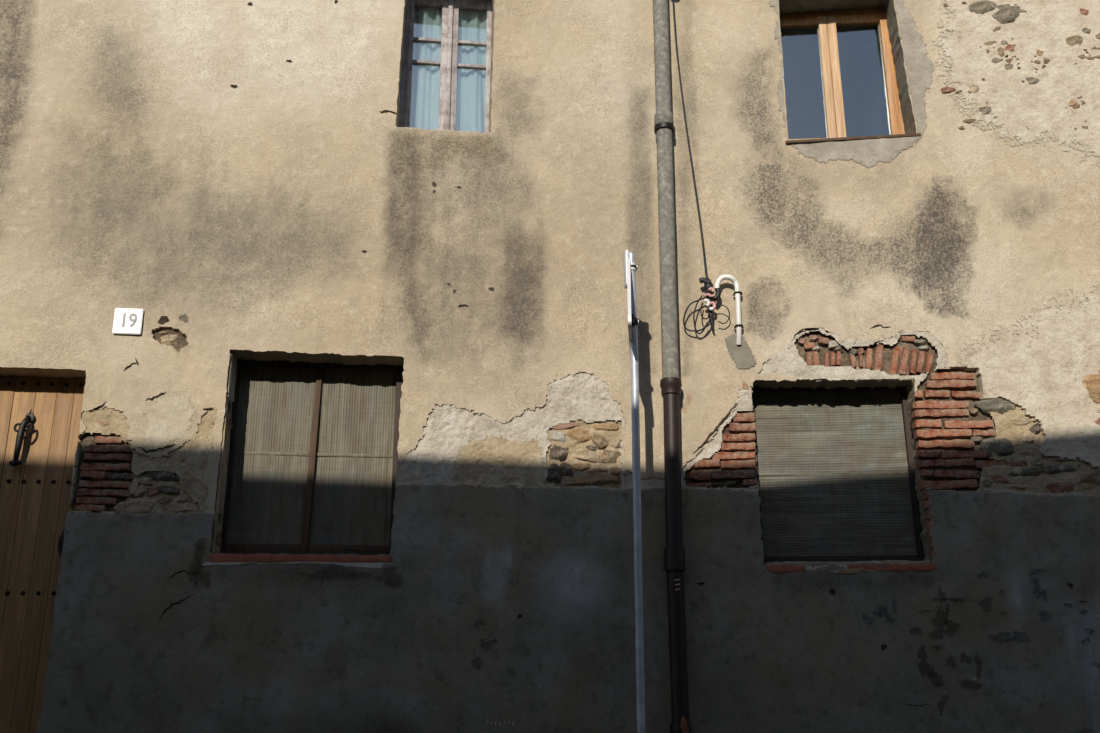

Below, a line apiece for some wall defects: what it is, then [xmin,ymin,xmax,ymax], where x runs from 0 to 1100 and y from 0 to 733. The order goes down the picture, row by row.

damp [0,0,26,147]
spalling [927,0,1100,178]
damp [753,162,971,316]
peeling [70,394,217,515]
spalling [153,328,188,351]
peeling [400,372,665,493]
spalling [681,387,757,491]
spalling [759,283,1100,496]
crack [159,570,195,619]